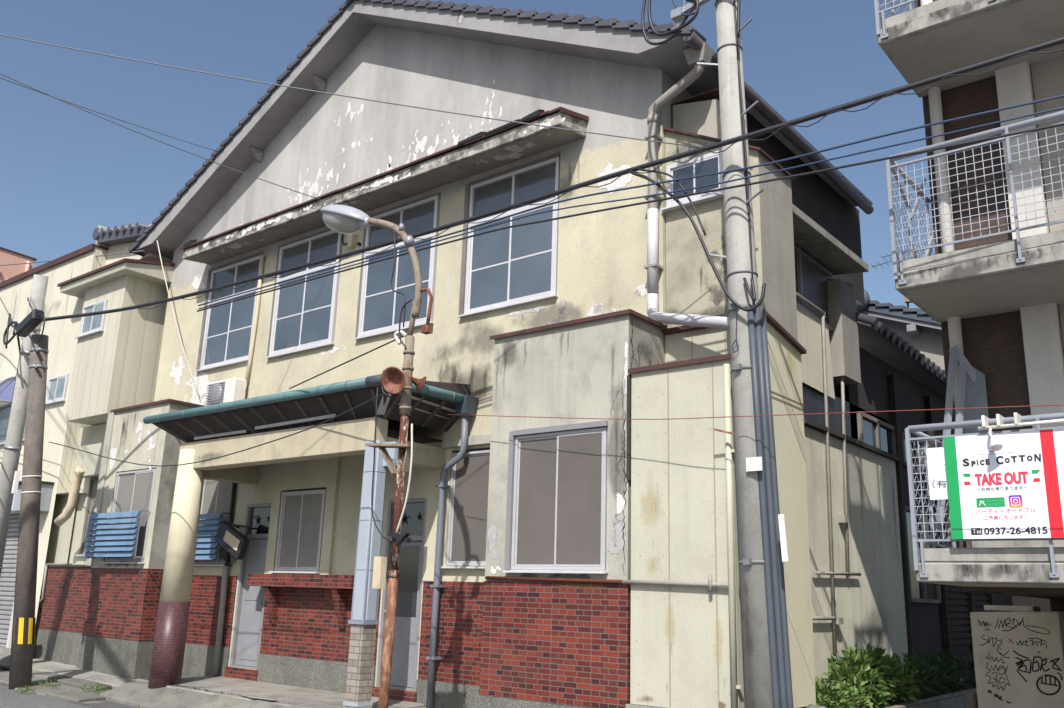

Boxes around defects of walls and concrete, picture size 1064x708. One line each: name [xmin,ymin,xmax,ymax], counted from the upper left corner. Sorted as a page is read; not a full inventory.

peeling [203,78,502,253]
peeling [598,162,633,195]
peeling [169,352,215,405]
peeling [110,445,128,471]
peeling [136,421,156,470]
crack [609,323,638,571]